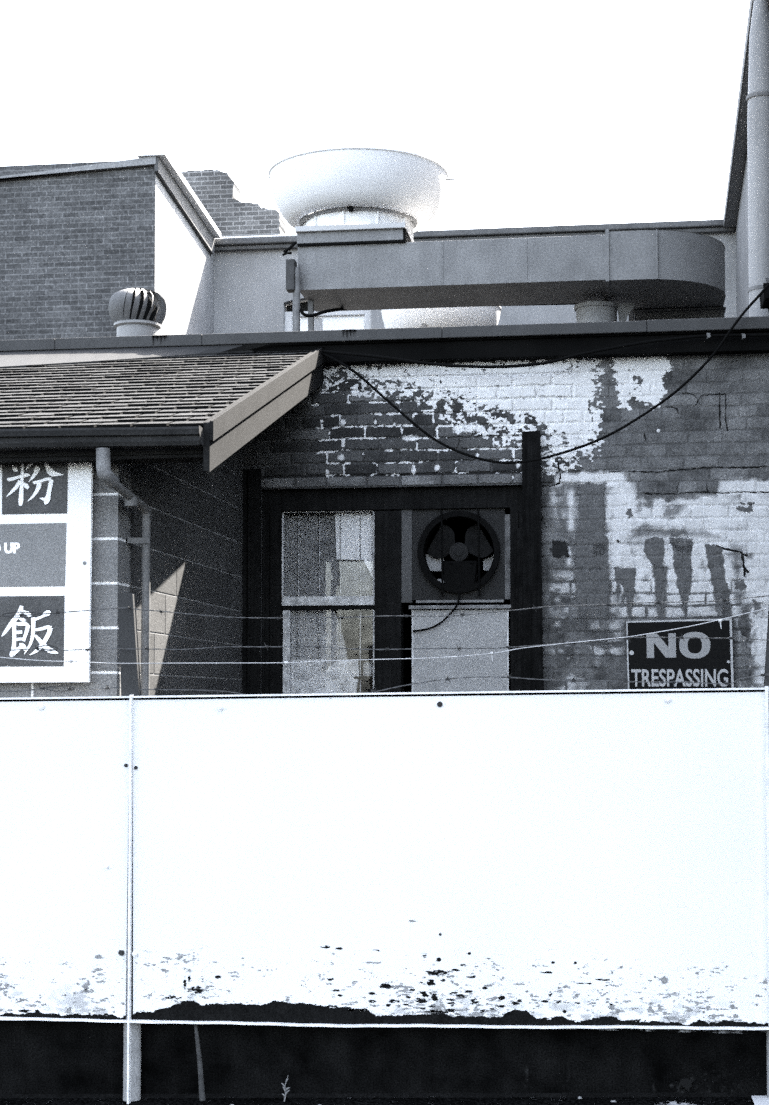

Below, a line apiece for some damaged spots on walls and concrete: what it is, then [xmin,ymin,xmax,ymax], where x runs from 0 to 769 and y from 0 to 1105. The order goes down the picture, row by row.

peeling [311,356,769,688]
damp [550,483,636,634]
damp [644,537,732,620]
peeling [0,945,769,1031]